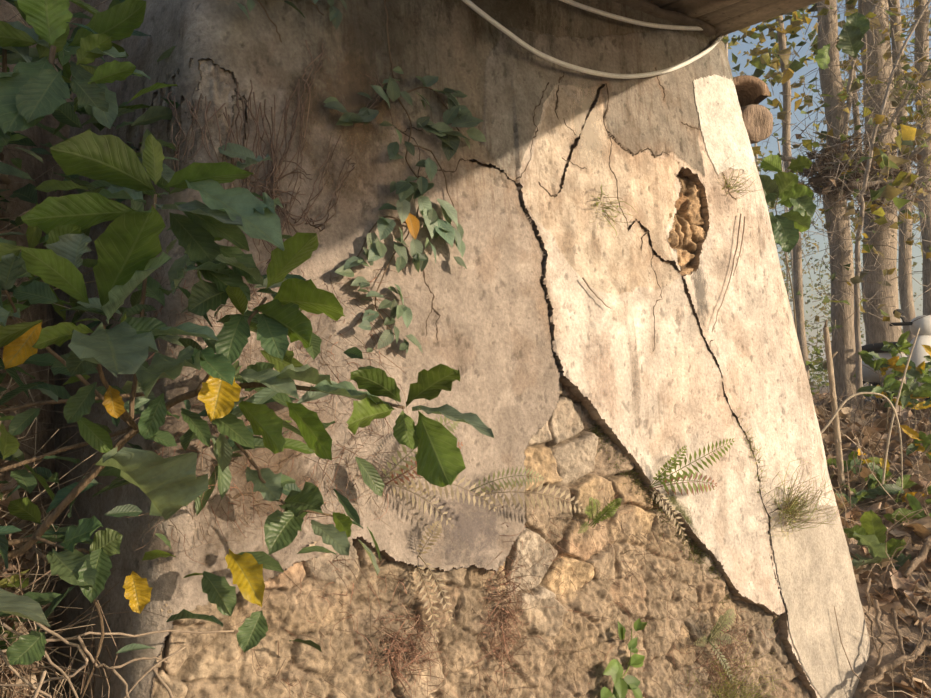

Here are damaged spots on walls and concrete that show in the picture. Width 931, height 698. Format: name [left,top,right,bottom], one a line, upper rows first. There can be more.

crack [381,97,490,178]
crack [515,72,587,197]
crack [588,83,685,351]
spalling [668,162,706,275]
crack [423,270,441,340]
spalling [147,381,812,698]